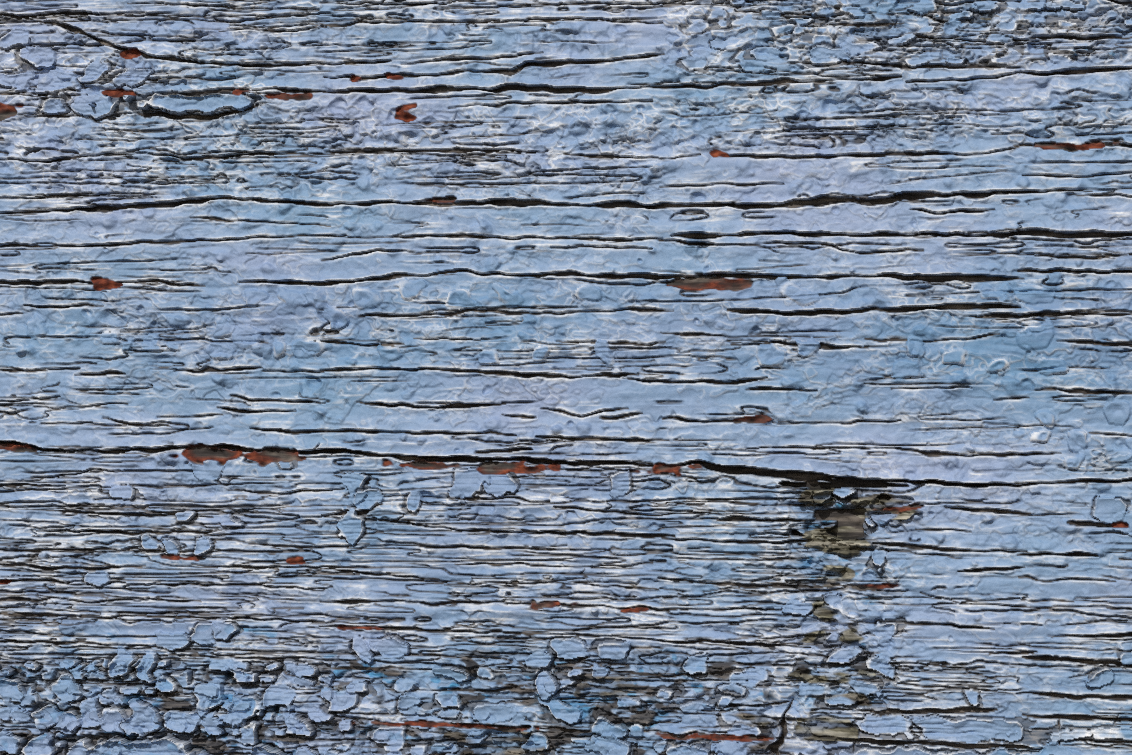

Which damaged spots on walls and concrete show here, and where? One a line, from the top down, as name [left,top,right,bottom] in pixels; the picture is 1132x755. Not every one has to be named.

peeling [0,28,256,120]
peeling [520,46,592,87]
crack [0,0,1132,120]
peeling [643,0,1132,98]
crack [0,144,1132,693]
peeling [449,461,526,516]
crack [679,419,1132,755]
peeling [766,467,1132,755]
crack [438,721,510,729]
crack [540,726,593,734]
peeling [501,614,774,755]
crack [629,729,707,737]